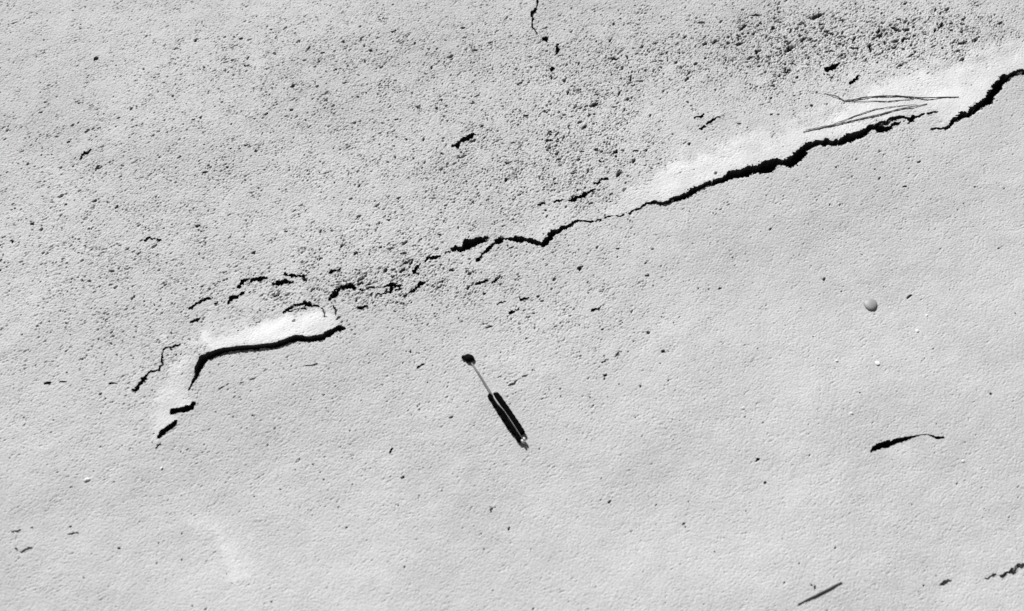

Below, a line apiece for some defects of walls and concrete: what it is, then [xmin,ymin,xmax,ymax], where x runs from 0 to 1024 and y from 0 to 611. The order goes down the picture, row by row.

crack [530,0,560,72]
crack [823,62,861,85]
crack [108,69,1024,449]
crack [870,434,945,453]